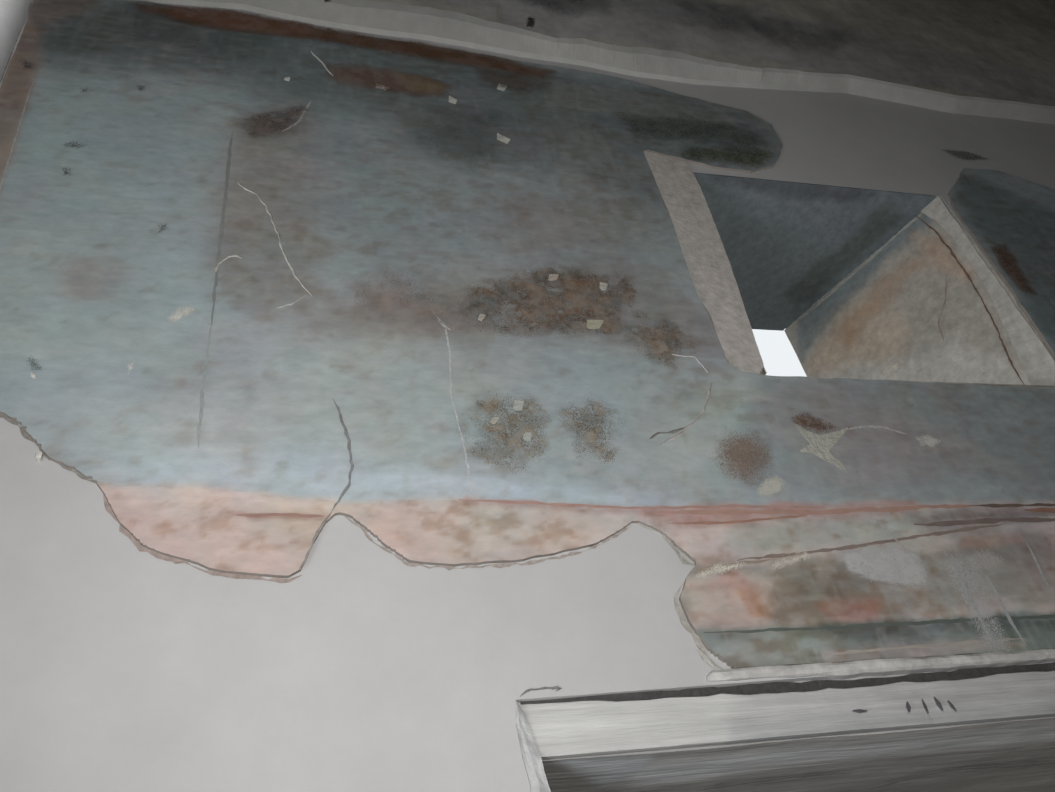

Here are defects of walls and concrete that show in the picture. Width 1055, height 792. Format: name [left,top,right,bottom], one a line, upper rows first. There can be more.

crack [214,255,242,274]
crack [238,183,312,308]
spalling [451,259,640,340]
crack [796,213,1024,384]
crack [432,311,472,496]
spalling [449,391,629,475]
crack [649,354,712,446]
spalling [788,410,842,433]
crack [0,399,1055,704]
peeling [696,562,746,578]
peeling [770,551,811,570]
peeling [840,545,929,588]